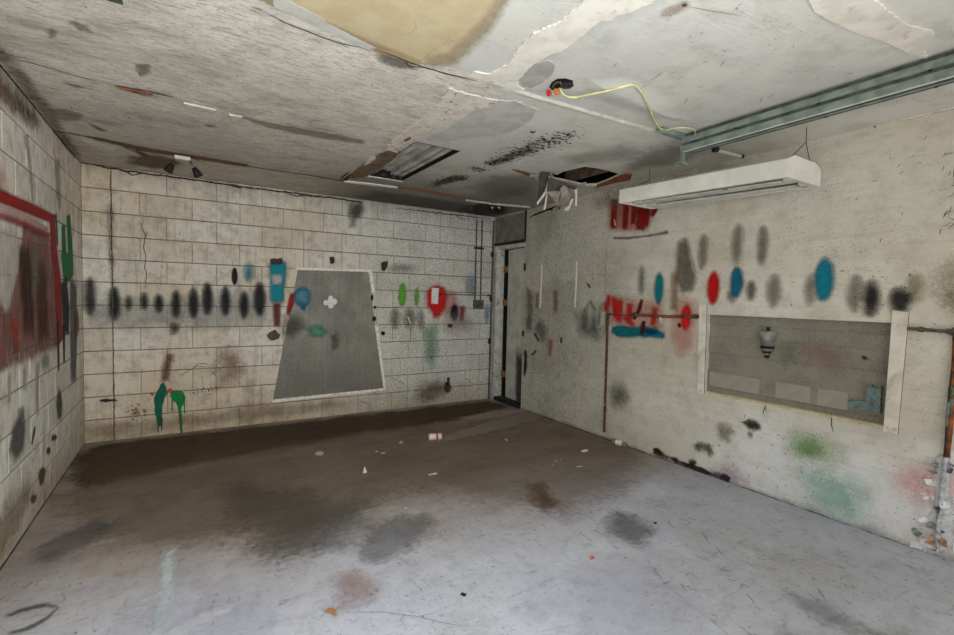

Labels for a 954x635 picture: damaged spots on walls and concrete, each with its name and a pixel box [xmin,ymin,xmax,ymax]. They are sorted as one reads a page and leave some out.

peeling [273,0,375,49]
peeling [808,0,935,58]
peeling [386,0,653,153]
peeling [344,156,398,189]
damp [424,125,585,189]